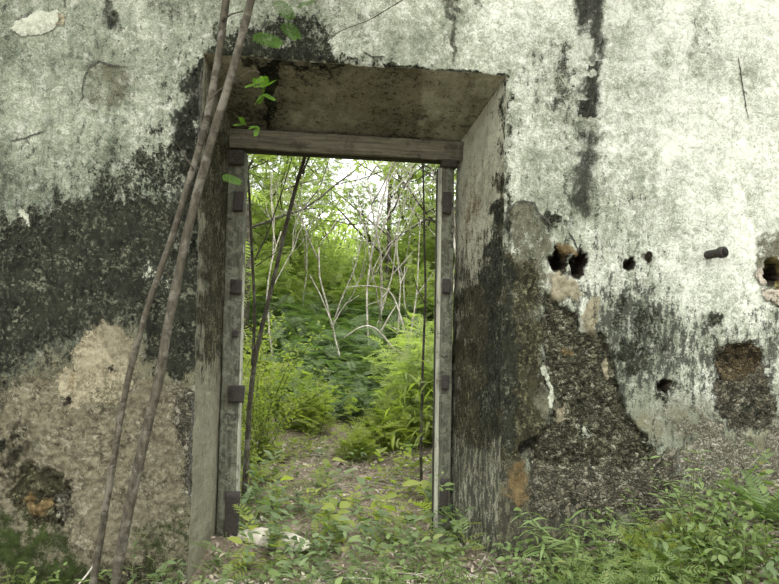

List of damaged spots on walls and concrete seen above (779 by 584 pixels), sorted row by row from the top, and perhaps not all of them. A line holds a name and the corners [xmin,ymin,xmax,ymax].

peeling [9,6,66,36]
leakage [102,0,119,29]
leakage [547,0,608,216]
leakage [0,207,48,284]
leakage [540,210,574,234]
leakage [121,259,198,385]
spalling [519,235,779,525]